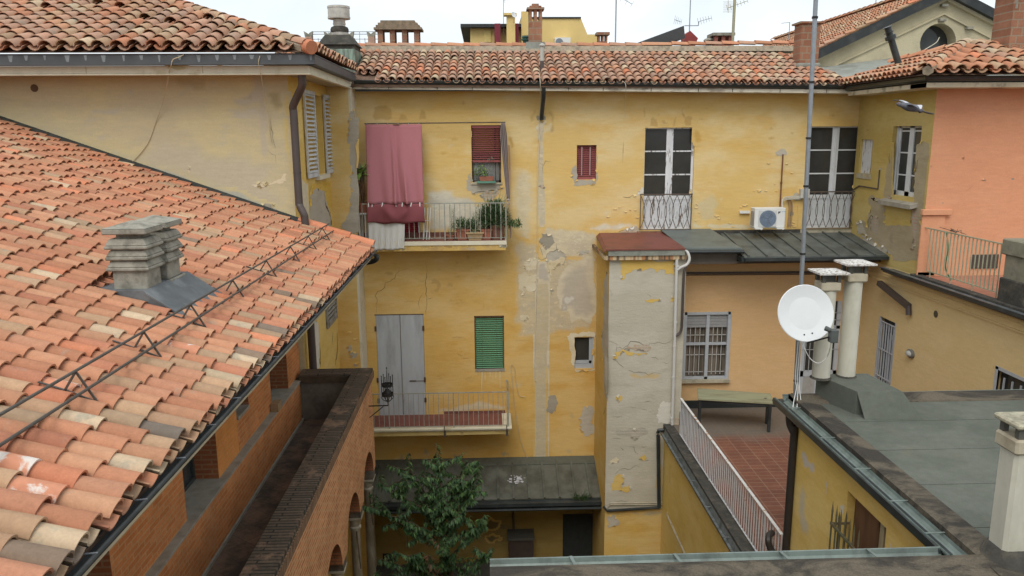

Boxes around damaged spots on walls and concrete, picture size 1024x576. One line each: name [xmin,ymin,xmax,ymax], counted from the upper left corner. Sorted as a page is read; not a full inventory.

flaking render [99,109,359,235]
flaking render [422,156,651,372]
flaking render [856,140,932,262]
flaking render [578,405,594,437]